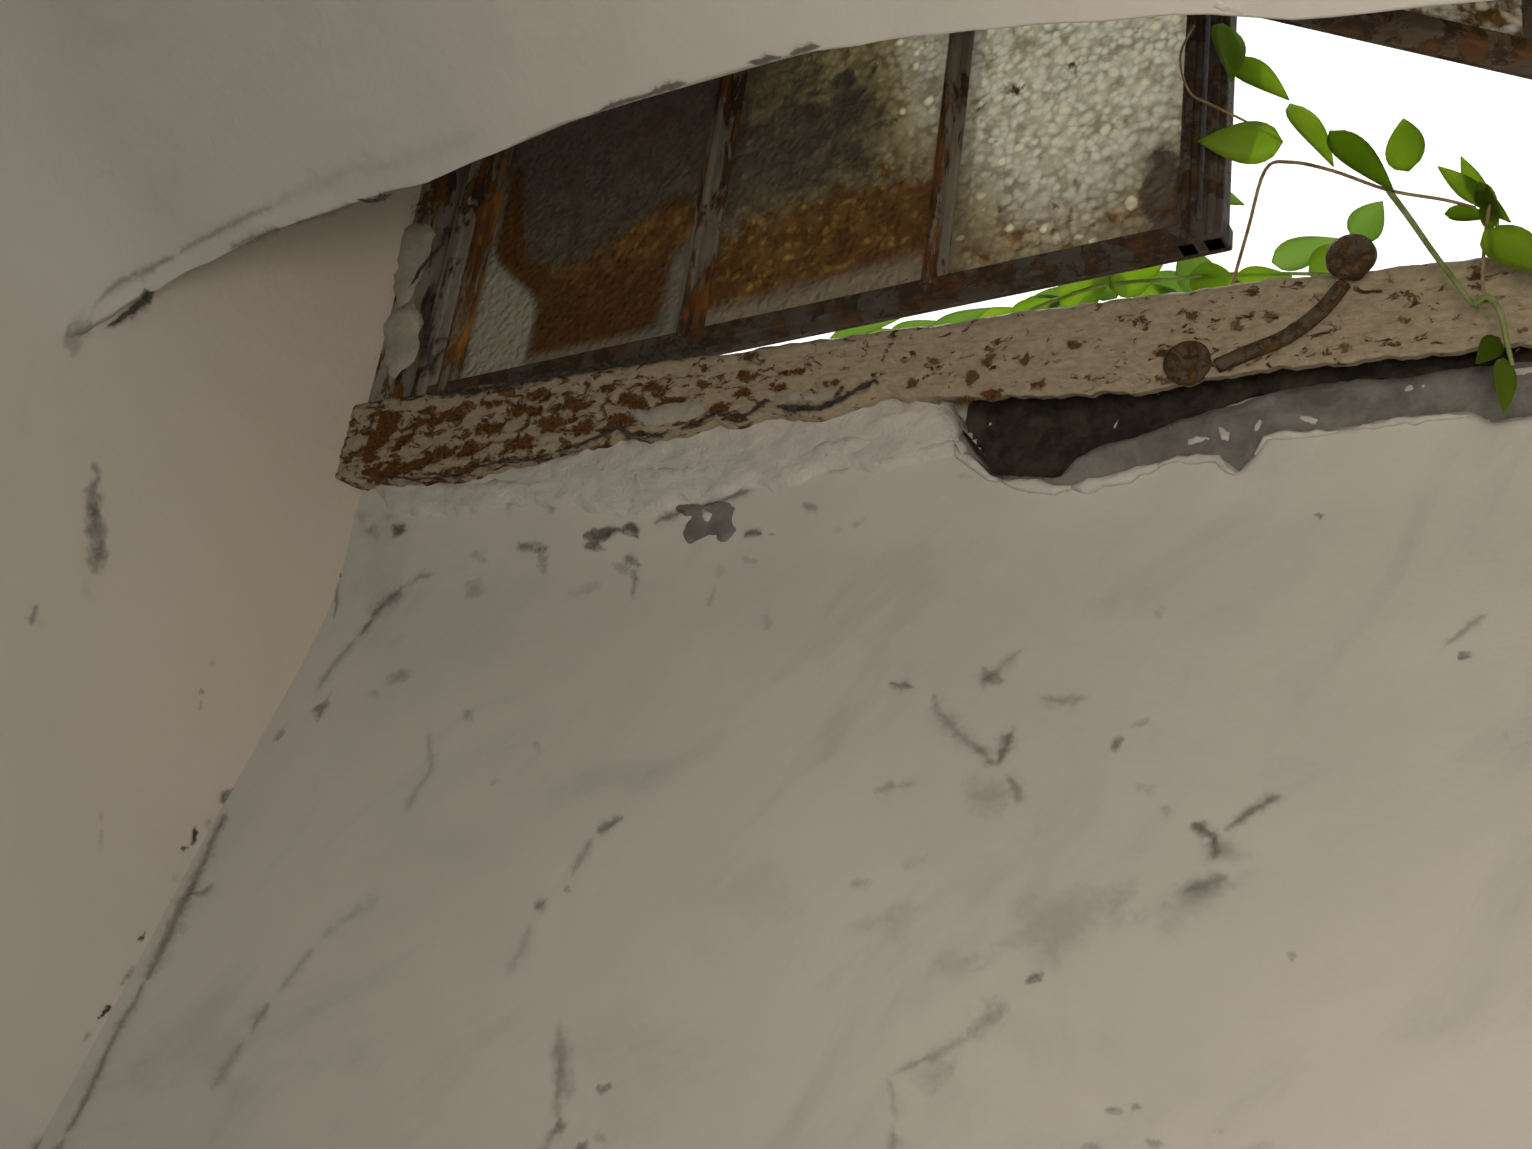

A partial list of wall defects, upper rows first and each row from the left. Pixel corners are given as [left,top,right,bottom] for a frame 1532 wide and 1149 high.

peeling [382,191,450,379]
corrosion [705,370,761,415]
corrosion [774,367,806,393]
corrosion [951,354,1004,406]
corrosion [361,379,712,483]
flaking render [952,346,1532,496]
flaking render [676,501,760,544]